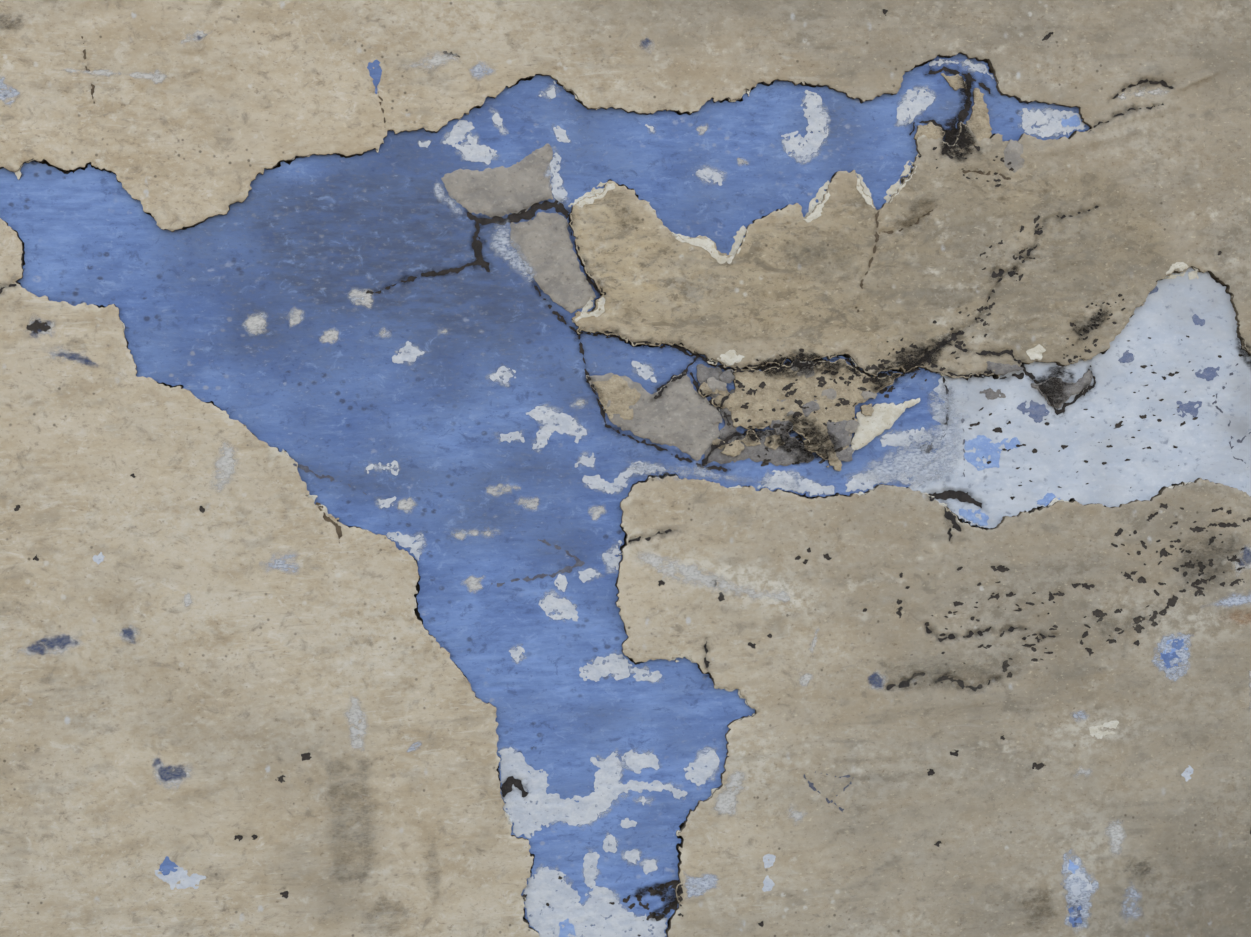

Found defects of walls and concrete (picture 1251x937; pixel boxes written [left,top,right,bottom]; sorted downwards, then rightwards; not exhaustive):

peeling [367,60,382,94]
crack [366,200,606,296]
flaking render [26,320,54,334]
crack [534,206,1099,543]
flaking render [1026,344,1046,360]
flaking render [1106,507,1251,646]
peeling [21,635,80,655]
flaking render [925,565,1095,662]
flaking render [1080,609,1122,656]
water stain [1216,595,1251,606]
peeling [155,856,206,890]
peeling [1062,850,1098,931]